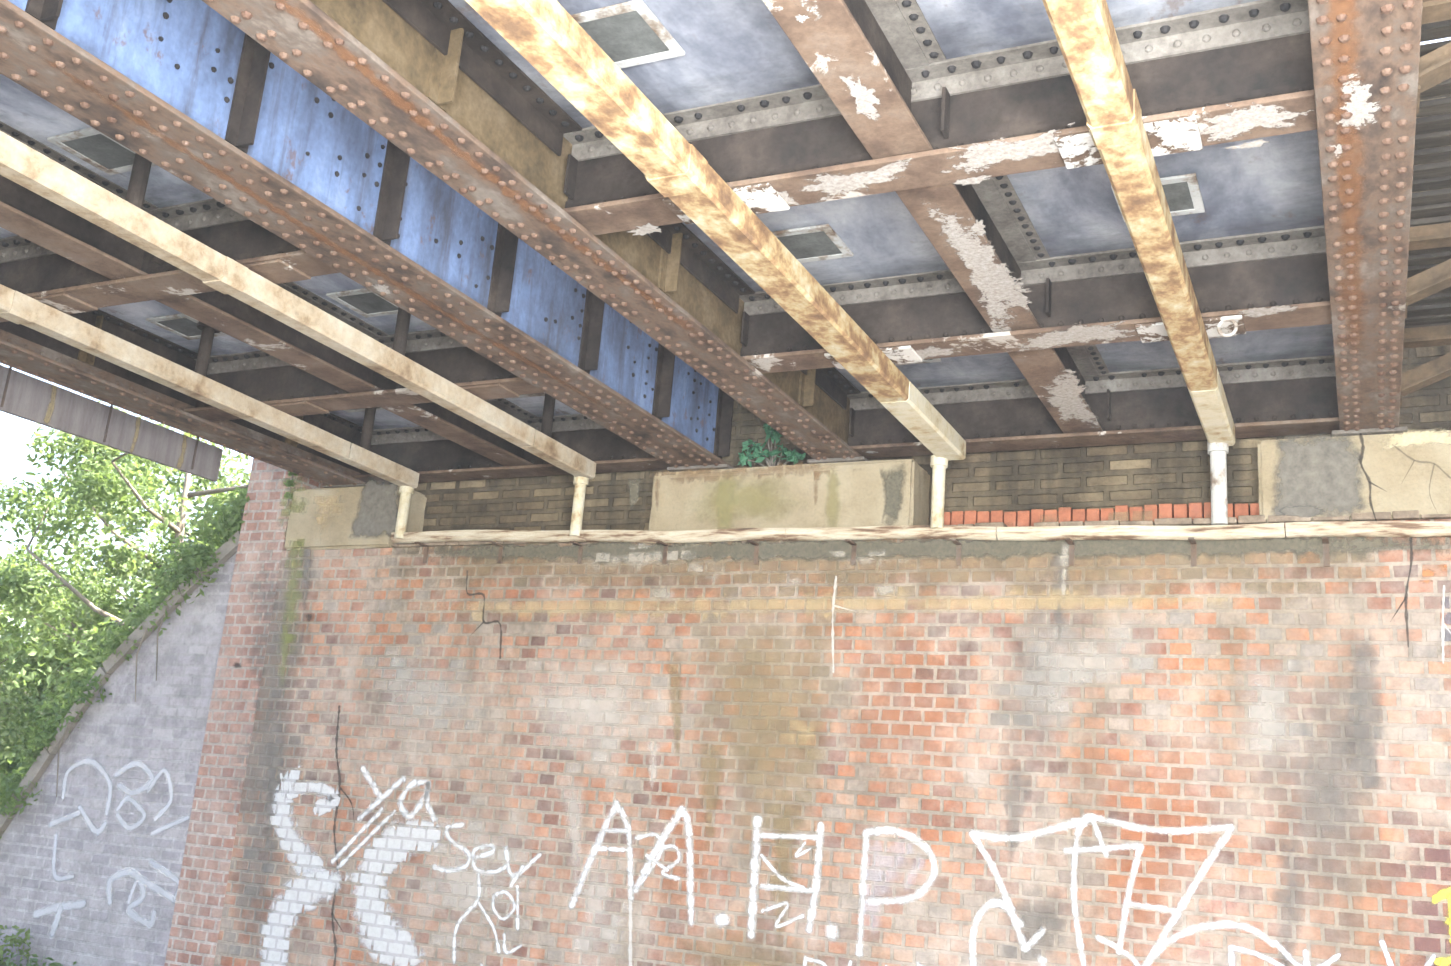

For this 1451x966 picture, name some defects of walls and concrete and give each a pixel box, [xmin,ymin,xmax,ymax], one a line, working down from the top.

corrosion [283,2,690,329]
peeling [776,158,912,205]
peeling [839,76,881,120]
peeling [941,122,1075,186]
peeling [1200,102,1314,150]
peeling [1329,67,1381,158]
peeling [921,202,1139,352]
peeling [1040,368,1098,428]
crack [1359,433,1387,520]
crack [466,571,502,659]
crack [1390,537,1451,664]
crack [331,705,355,966]